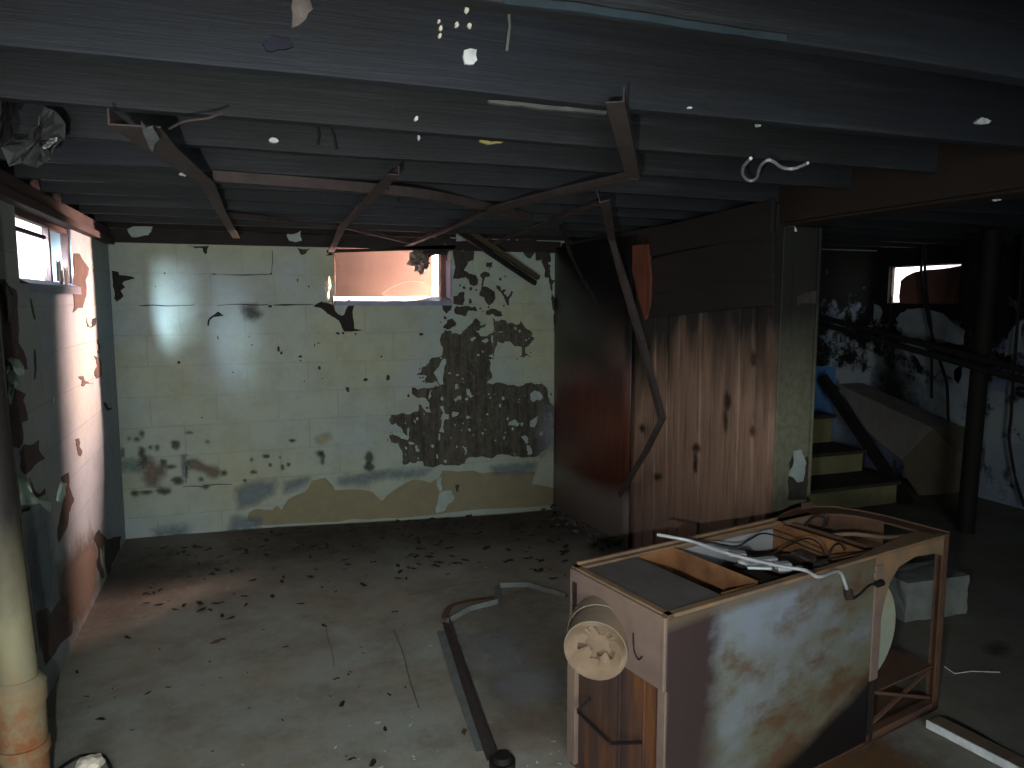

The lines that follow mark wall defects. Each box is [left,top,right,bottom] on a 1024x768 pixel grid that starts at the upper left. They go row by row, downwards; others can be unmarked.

peeling [127,226,152,237]
peeling [112,271,135,302]
peeling [79,340,102,387]
peeling [248,231,555,525]
peeling [0,279,74,543]
damp [232,455,290,531]
damp [340,452,412,484]
peeling [788,450,809,500]
spalling [94,530,121,581]
peeling [36,596,73,665]